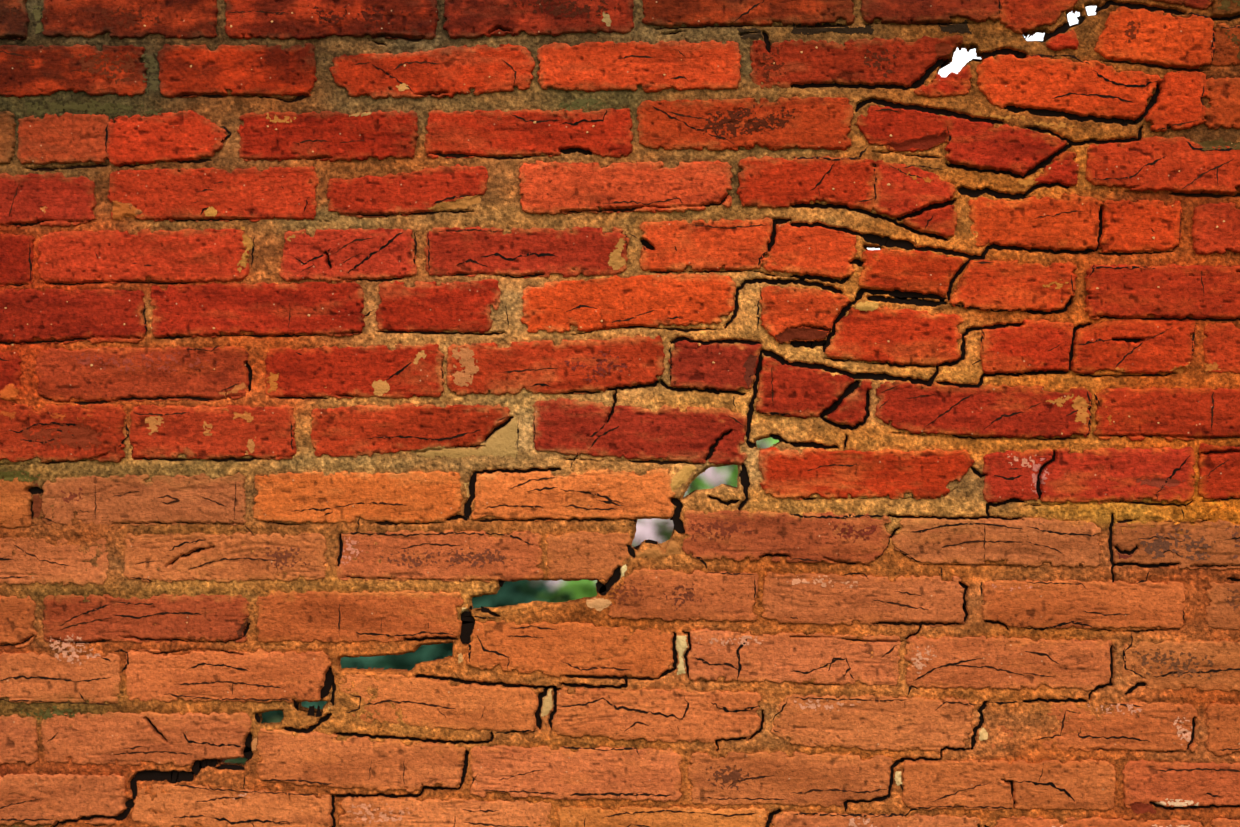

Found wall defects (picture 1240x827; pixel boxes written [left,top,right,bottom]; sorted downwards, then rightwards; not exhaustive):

crack [229,10,333,24]
crack [105,116,124,152]
crack [221,126,232,143]
crack [26,245,34,280]
crack [293,0,1240,598]
crack [185,344,252,393]
crack [0,391,1240,827]